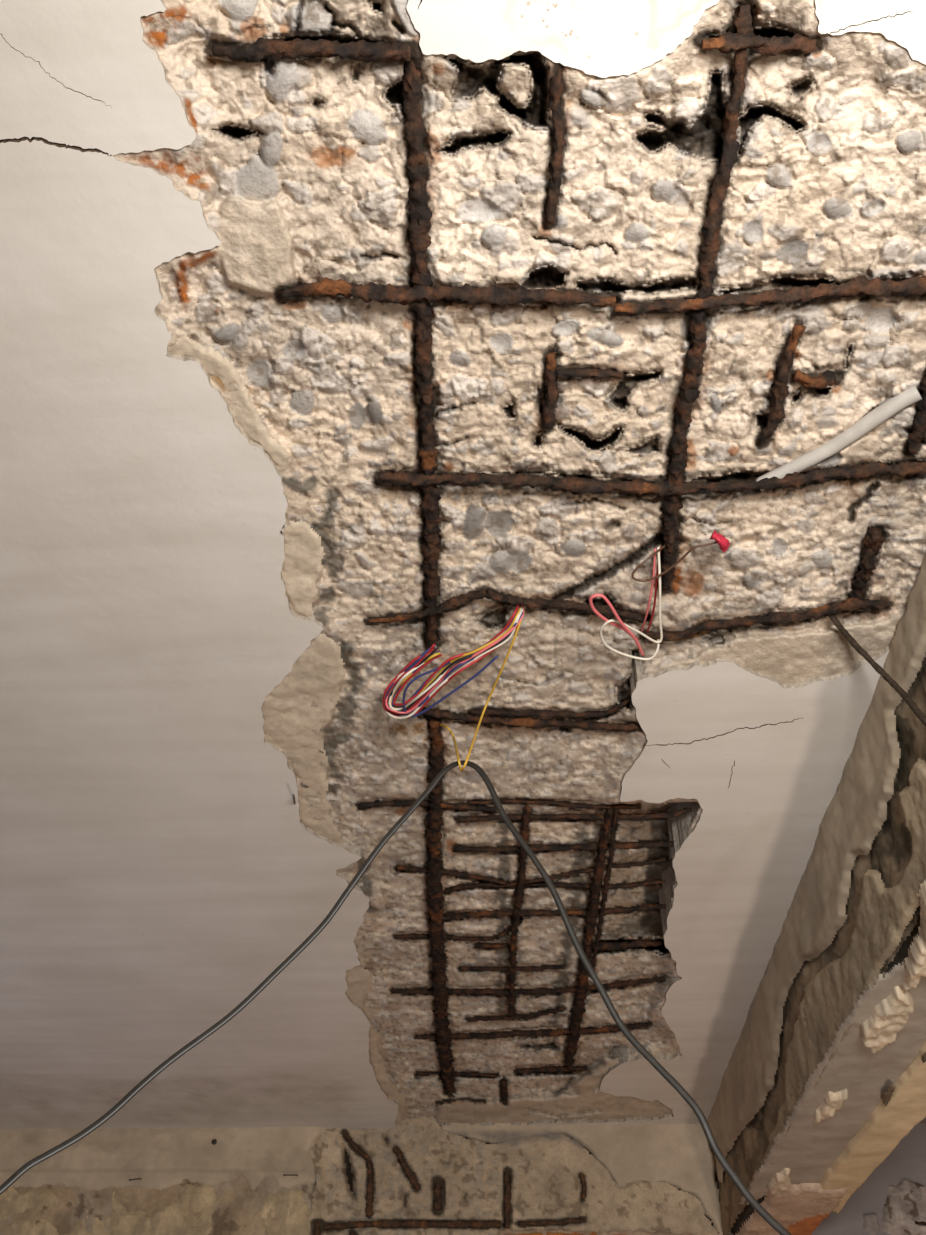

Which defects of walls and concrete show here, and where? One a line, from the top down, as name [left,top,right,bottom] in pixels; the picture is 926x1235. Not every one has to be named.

corrosion [144,7,187,47]
crack [1,34,112,108]
corrosion [186,99,197,130]
crack [0,137,108,155]
corrosion [140,154,207,188]
spalling [108,0,926,1056]
peeling [708,676,926,1189]
spalling [260,765,719,1235]
peeling [0,1184,224,1235]
flaking render [766,1168,791,1195]
spalling [863,1179,926,1235]